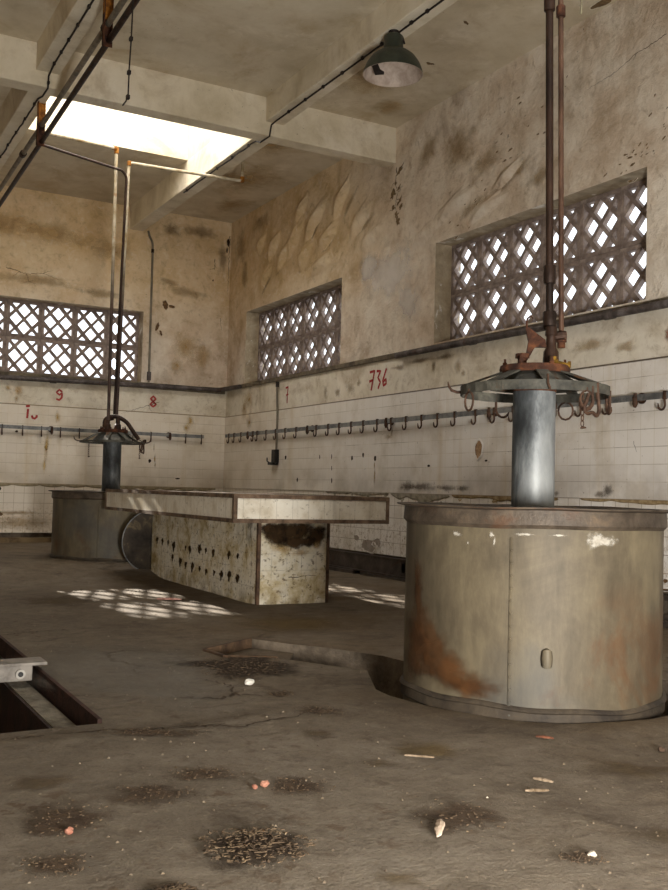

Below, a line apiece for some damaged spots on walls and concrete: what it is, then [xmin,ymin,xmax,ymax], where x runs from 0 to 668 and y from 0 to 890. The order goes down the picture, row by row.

peeling [325,491,511,503]
crack [179,678,262,699]
crack [3,712,305,740]